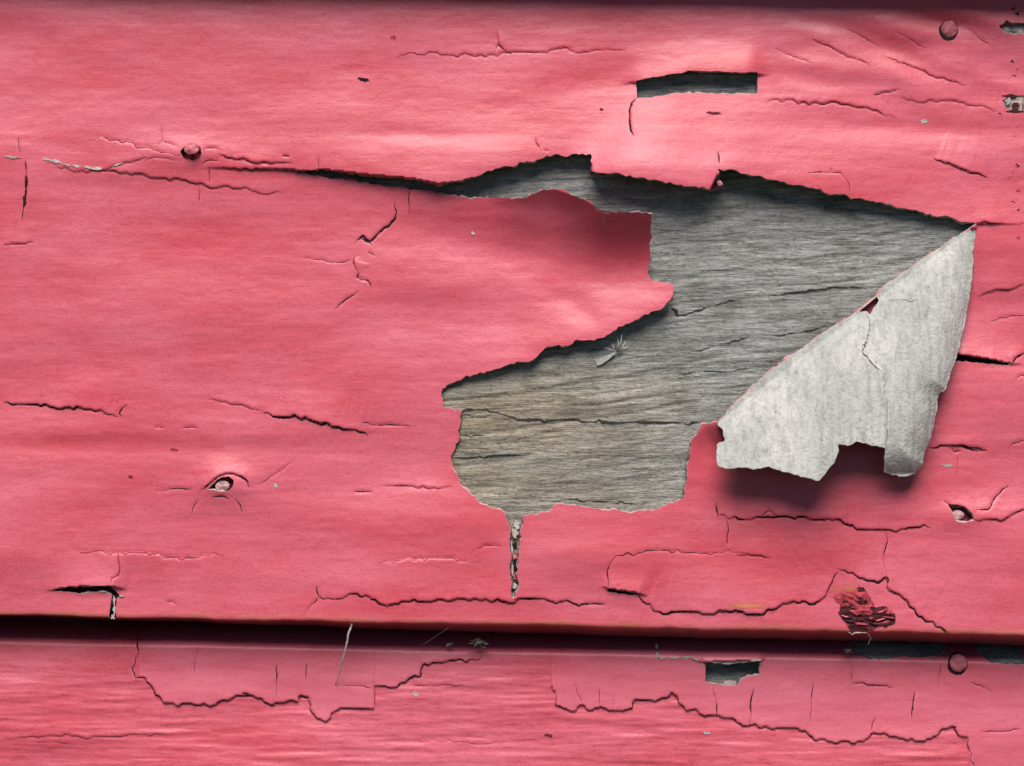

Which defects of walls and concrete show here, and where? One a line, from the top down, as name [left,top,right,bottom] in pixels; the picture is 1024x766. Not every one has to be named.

crack [397,33,624,57]
peeling [636,70,758,98]
crack [18,127,290,217]
crack [311,188,411,308]
crack [4,402,127,418]
crack [213,399,410,436]
peeling [276,154,978,598]
crack [945,485,1024,522]
crack [308,505,949,634]
crack [132,634,482,722]
peeling [654,644,761,686]
crack [552,667,1018,764]